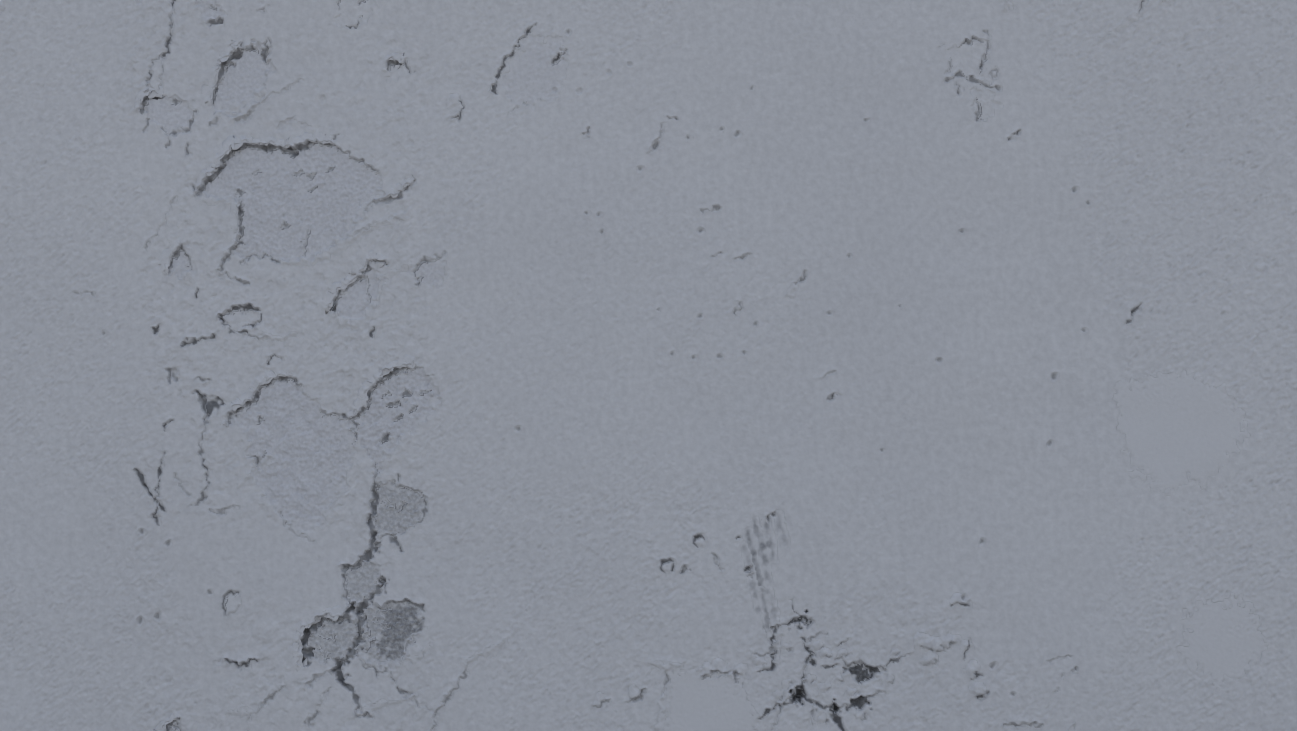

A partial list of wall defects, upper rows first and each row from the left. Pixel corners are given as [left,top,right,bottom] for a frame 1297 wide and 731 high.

peeling [195,0,227,31]
spalling [133,37,449,340]
peeling [180,333,216,348]
spalling [133,354,442,728]
peeling [153,713,182,731]
crack [752,595,912,731]